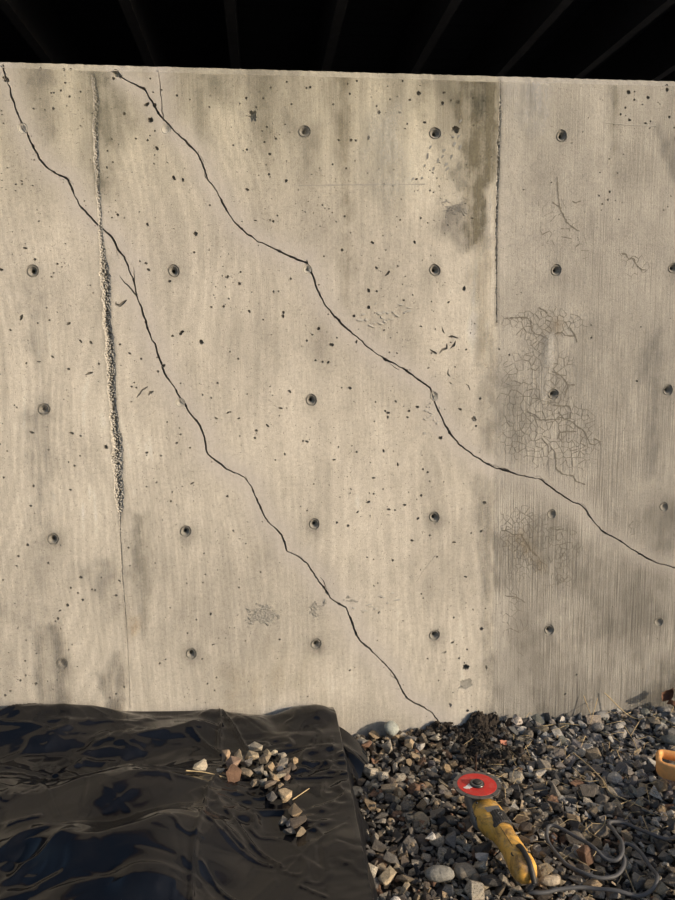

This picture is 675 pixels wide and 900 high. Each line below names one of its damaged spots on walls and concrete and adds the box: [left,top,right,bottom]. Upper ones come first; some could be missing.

crack [2,64,440,723]
crack [120,72,675,655]
leakage [448,81,499,247]